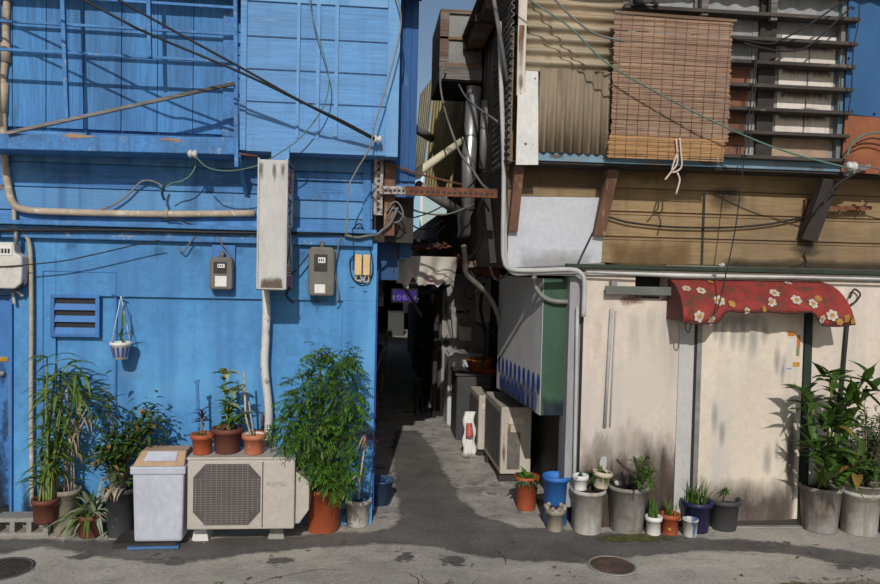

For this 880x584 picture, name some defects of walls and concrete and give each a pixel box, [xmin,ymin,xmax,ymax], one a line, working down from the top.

leakage [587,449,674,527]